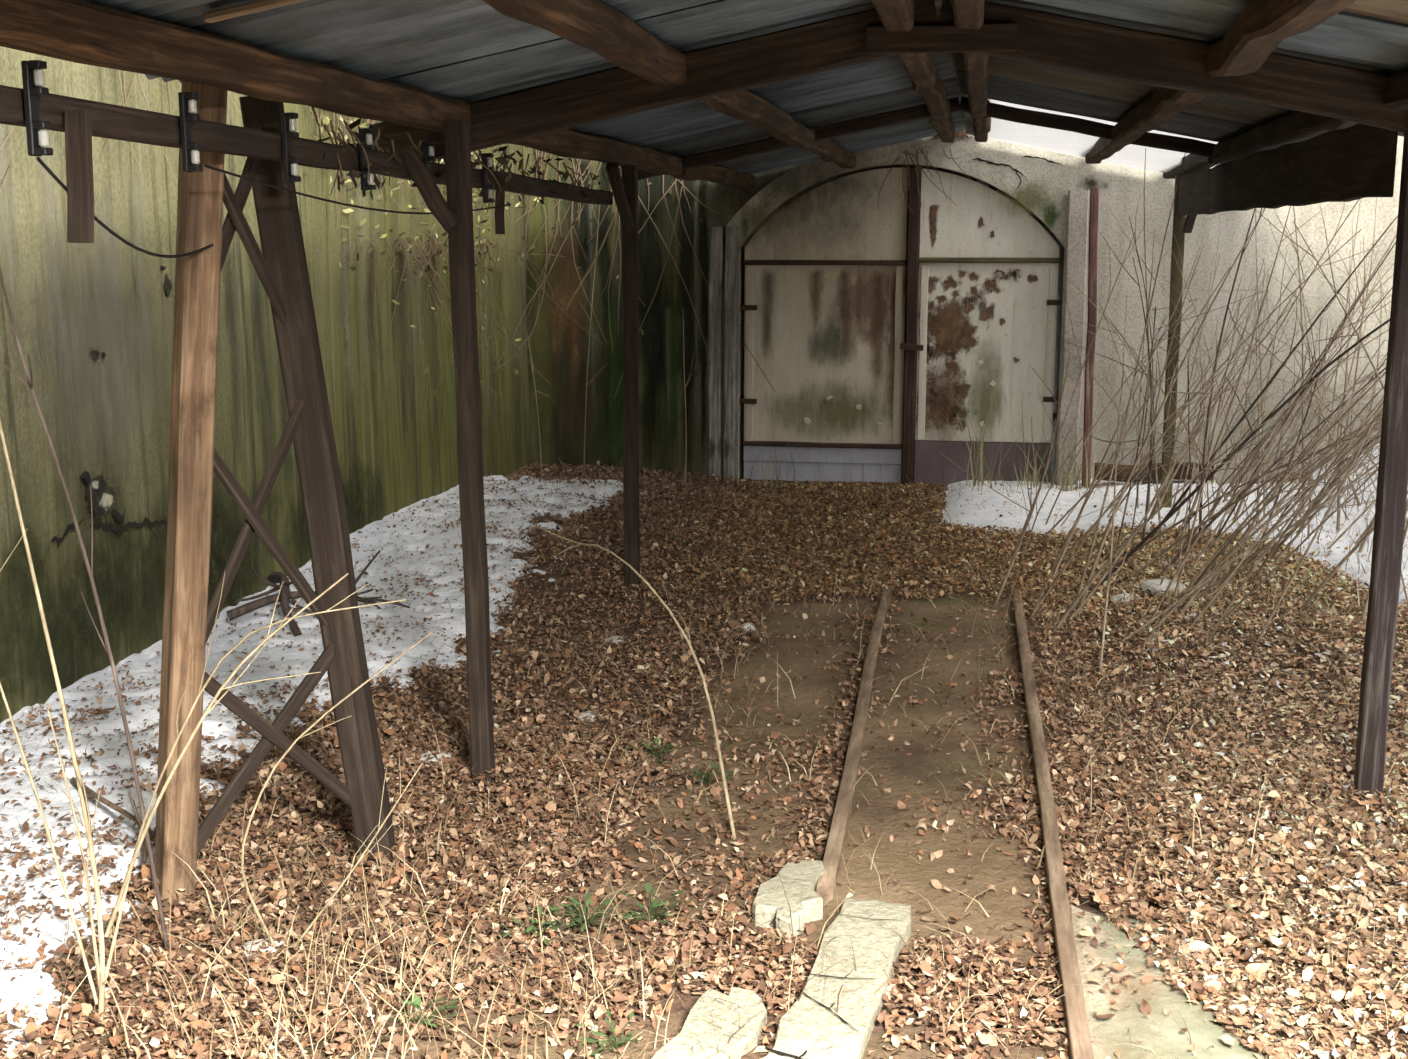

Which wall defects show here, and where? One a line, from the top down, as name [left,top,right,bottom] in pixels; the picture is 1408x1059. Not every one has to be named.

corrosion [929,205,938,245]
water stain [532,162,617,443]
water stain [638,171,822,450]
corrosion [811,272,821,318]
corrosion [841,273,906,399]
corrosion [916,268,1038,431]
water stain [342,476,378,535]
crack [795,973,877,1032]
crack [763,1045,807,1059]